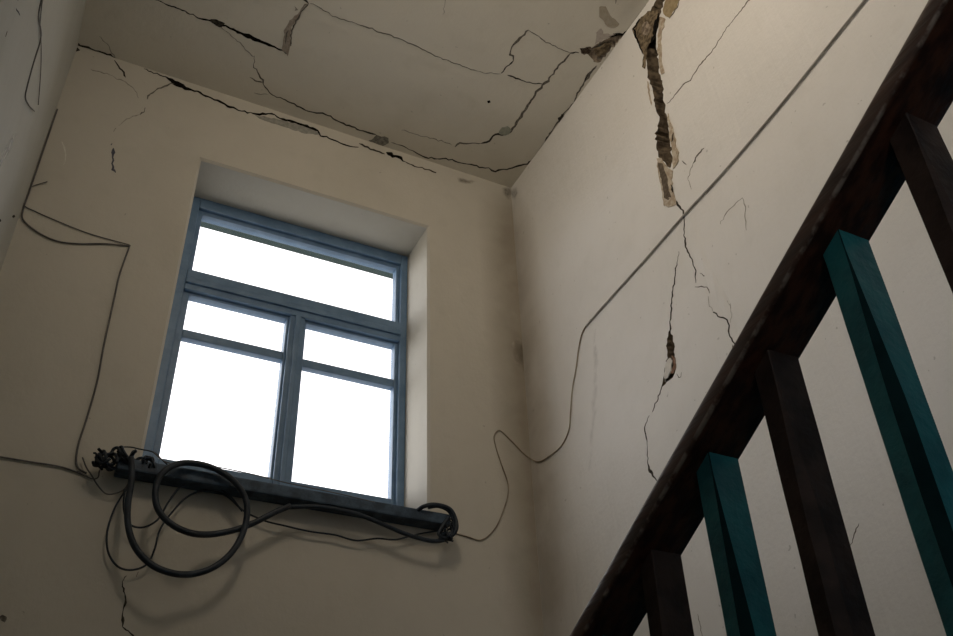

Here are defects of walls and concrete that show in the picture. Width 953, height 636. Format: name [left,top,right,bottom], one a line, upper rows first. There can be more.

flaking render [282,0,309,56]
crack [76,0,597,173]
spalling [580,6,634,63]
crack [632,0,750,347]
spalling [652,255,680,412]
crack [644,416,657,481]